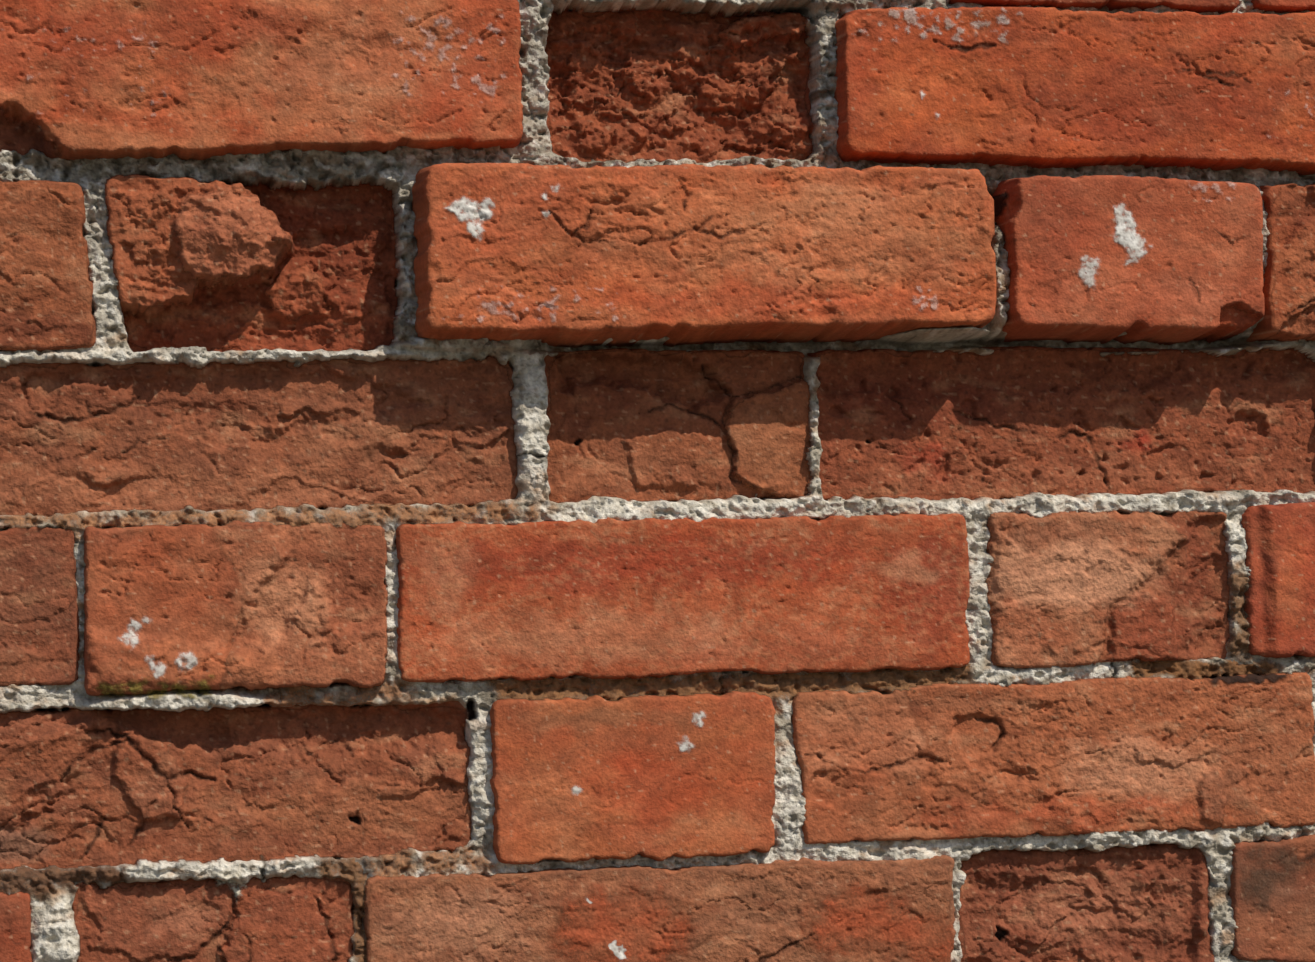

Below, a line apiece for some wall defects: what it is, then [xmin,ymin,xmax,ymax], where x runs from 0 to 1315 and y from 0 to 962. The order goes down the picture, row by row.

spalling [0,108,60,158]
spalling [545,7,815,163]
spalling [0,174,517,692]
crack [648,366,800,487]
spalling [75,186,1315,962]
crack [84,818,105,856]
crack [61,728,215,840]
spalling [0,704,471,870]
crack [174,901,252,962]
crack [739,935,812,962]